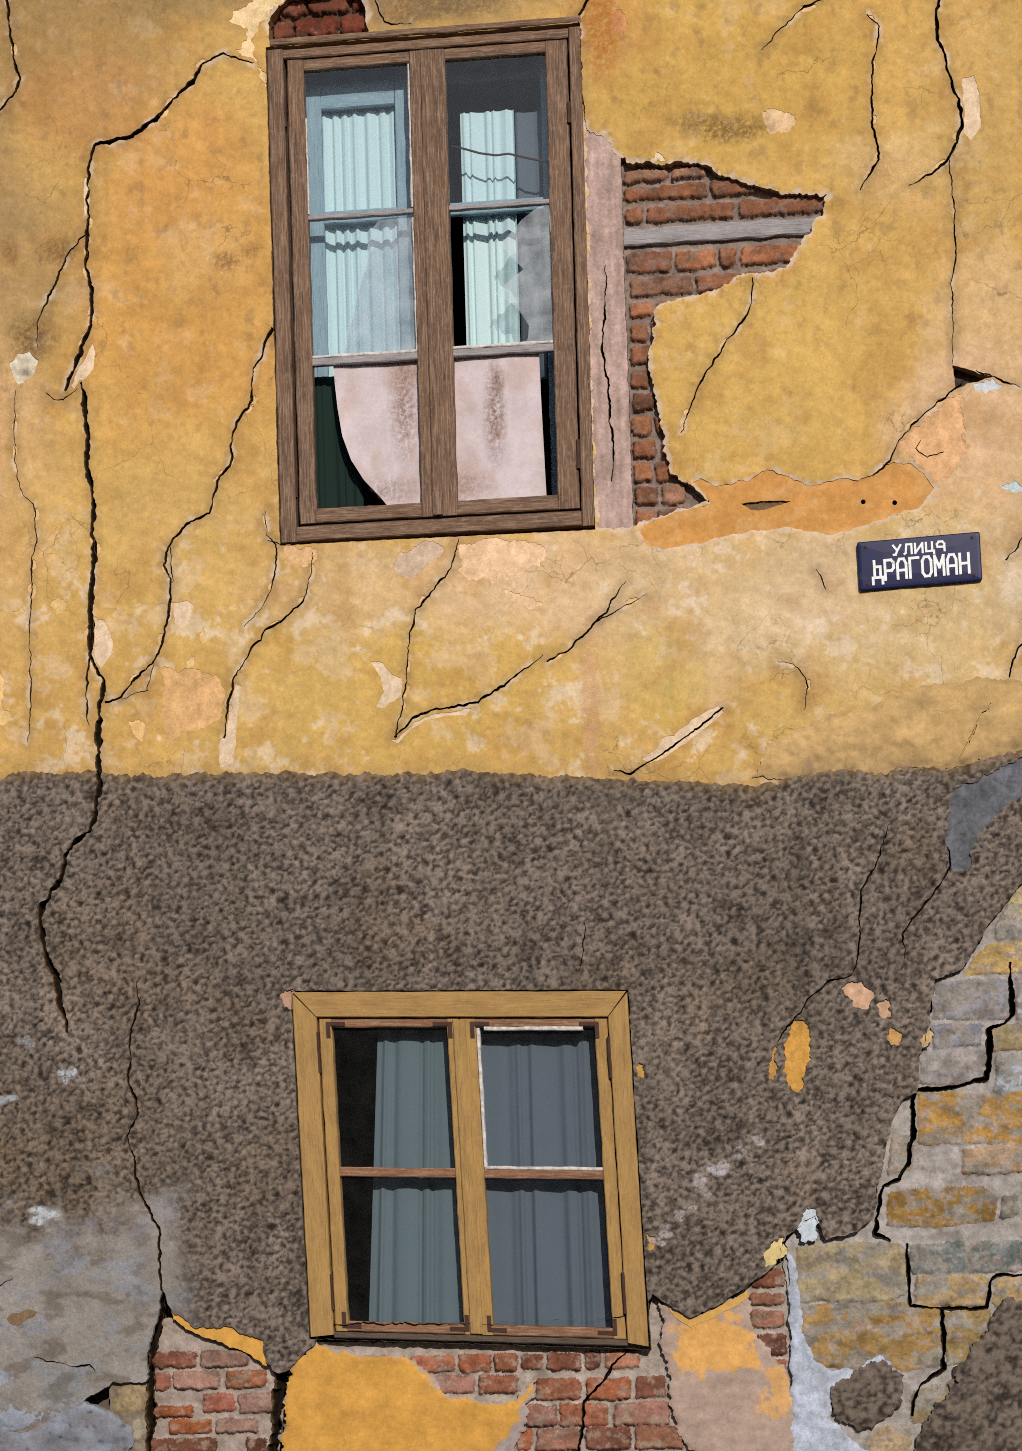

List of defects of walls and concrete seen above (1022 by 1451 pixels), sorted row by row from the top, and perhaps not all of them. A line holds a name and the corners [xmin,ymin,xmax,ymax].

crack [12,52,275,1033]
flaking render [229,0,369,87]
crack [370,539,644,743]
peeling [763,108,797,134]
flaking render [584,117,1002,549]
crack [872,0,1019,476]
crack [125,982,167,1451]
flaking render [84,1318,293,1451]
crack [267,1370,291,1451]
flaking render [304,1297,695,1451]
flaking render [687,884,1022,1451]
crack [873,962,1022,1416]